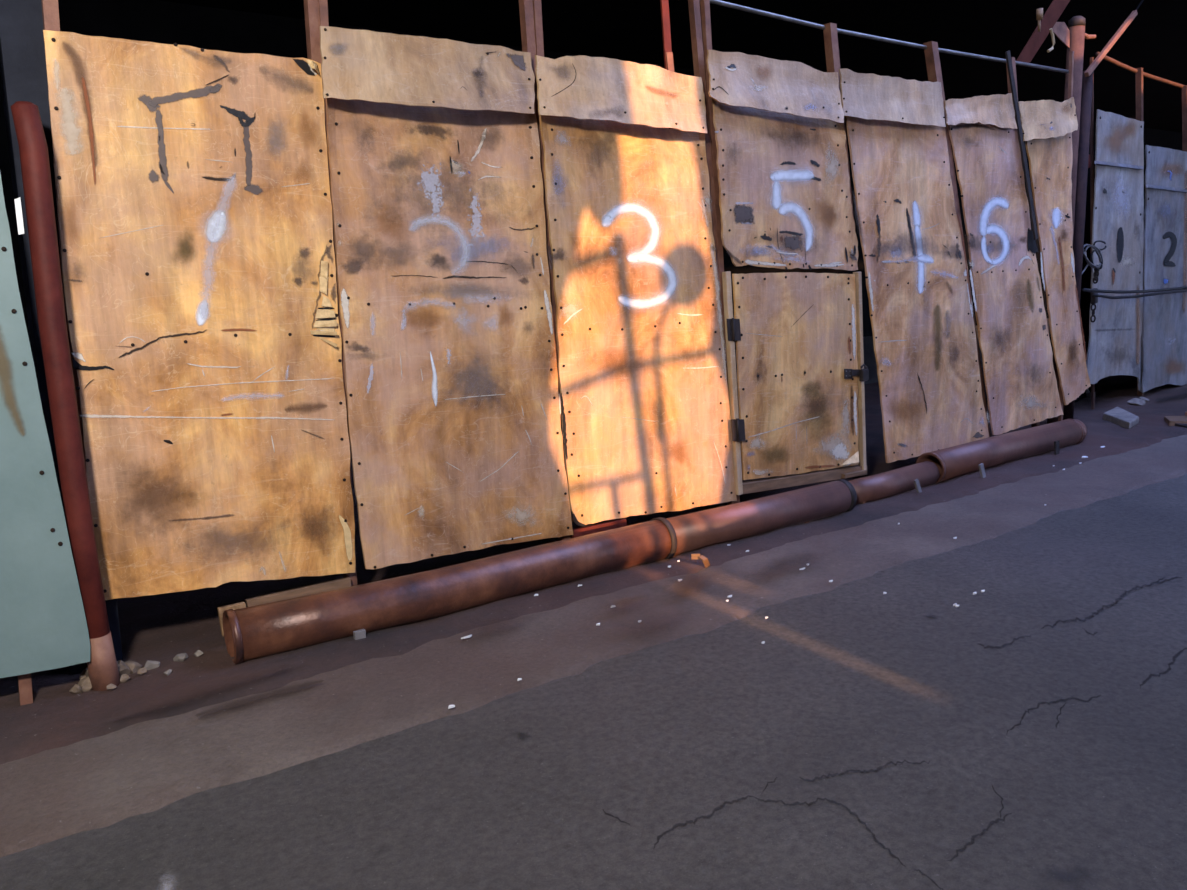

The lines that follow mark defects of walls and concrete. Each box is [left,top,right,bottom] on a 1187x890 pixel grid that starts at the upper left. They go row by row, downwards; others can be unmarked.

crack [979,577,1182,648]
crack [1140,648,1187,688]
crack [1007,696,1099,732]
crack [654,760,1011,890]